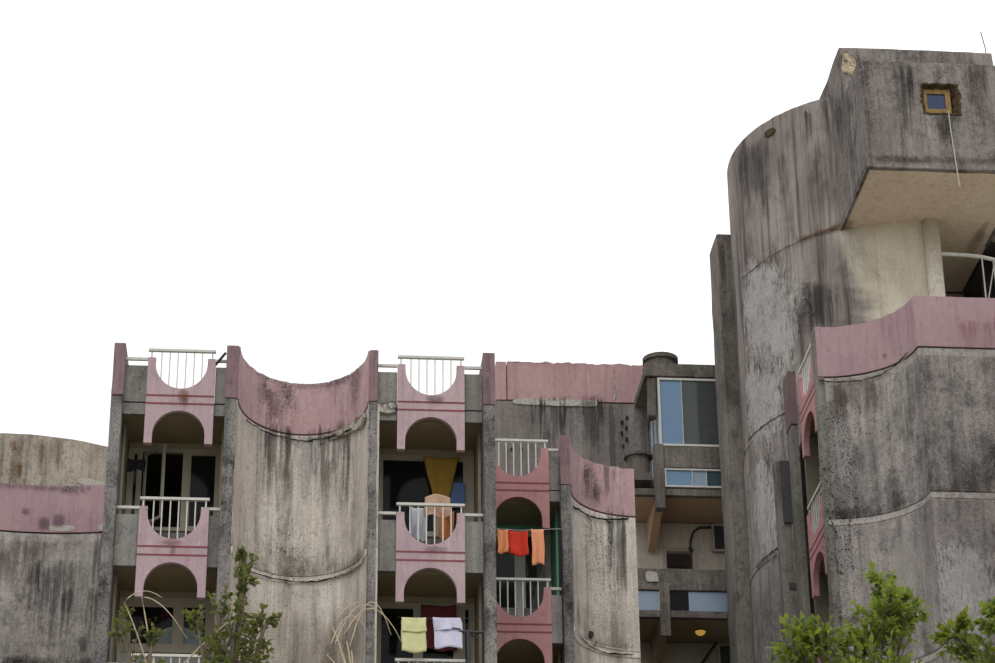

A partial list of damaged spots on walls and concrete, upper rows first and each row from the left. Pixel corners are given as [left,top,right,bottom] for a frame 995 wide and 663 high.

spalling [841,50,876,127]
crack [742,228,836,279]
water stain [743,260,804,558]
water stain [934,537,995,642]